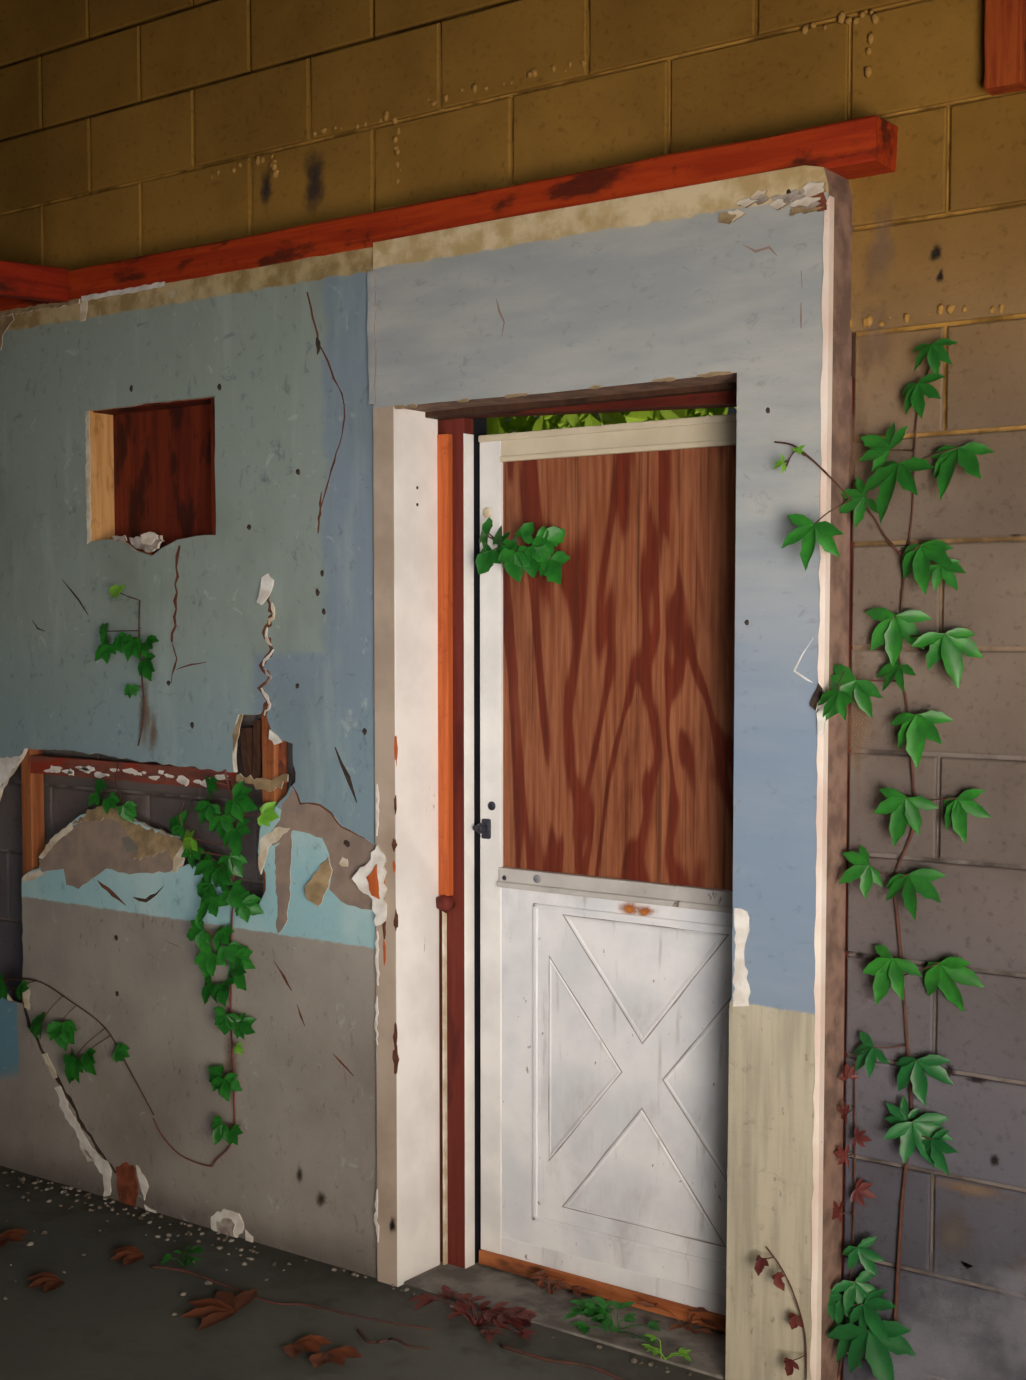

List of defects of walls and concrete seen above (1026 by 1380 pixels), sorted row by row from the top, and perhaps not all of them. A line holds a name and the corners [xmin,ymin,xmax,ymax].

damp [261,175,270,201]
damp [308,162,322,202]
spalling [718,182,828,224]
crack [306,292,345,533]
spalling [112,532,164,553]
crack [171,545,206,683]
spalling [335,747,357,803]
peeling [352,784,399,1074]
peeling [732,908,750,1007]
crack [23,988,116,1197]
spalling [210,1208,253,1242]